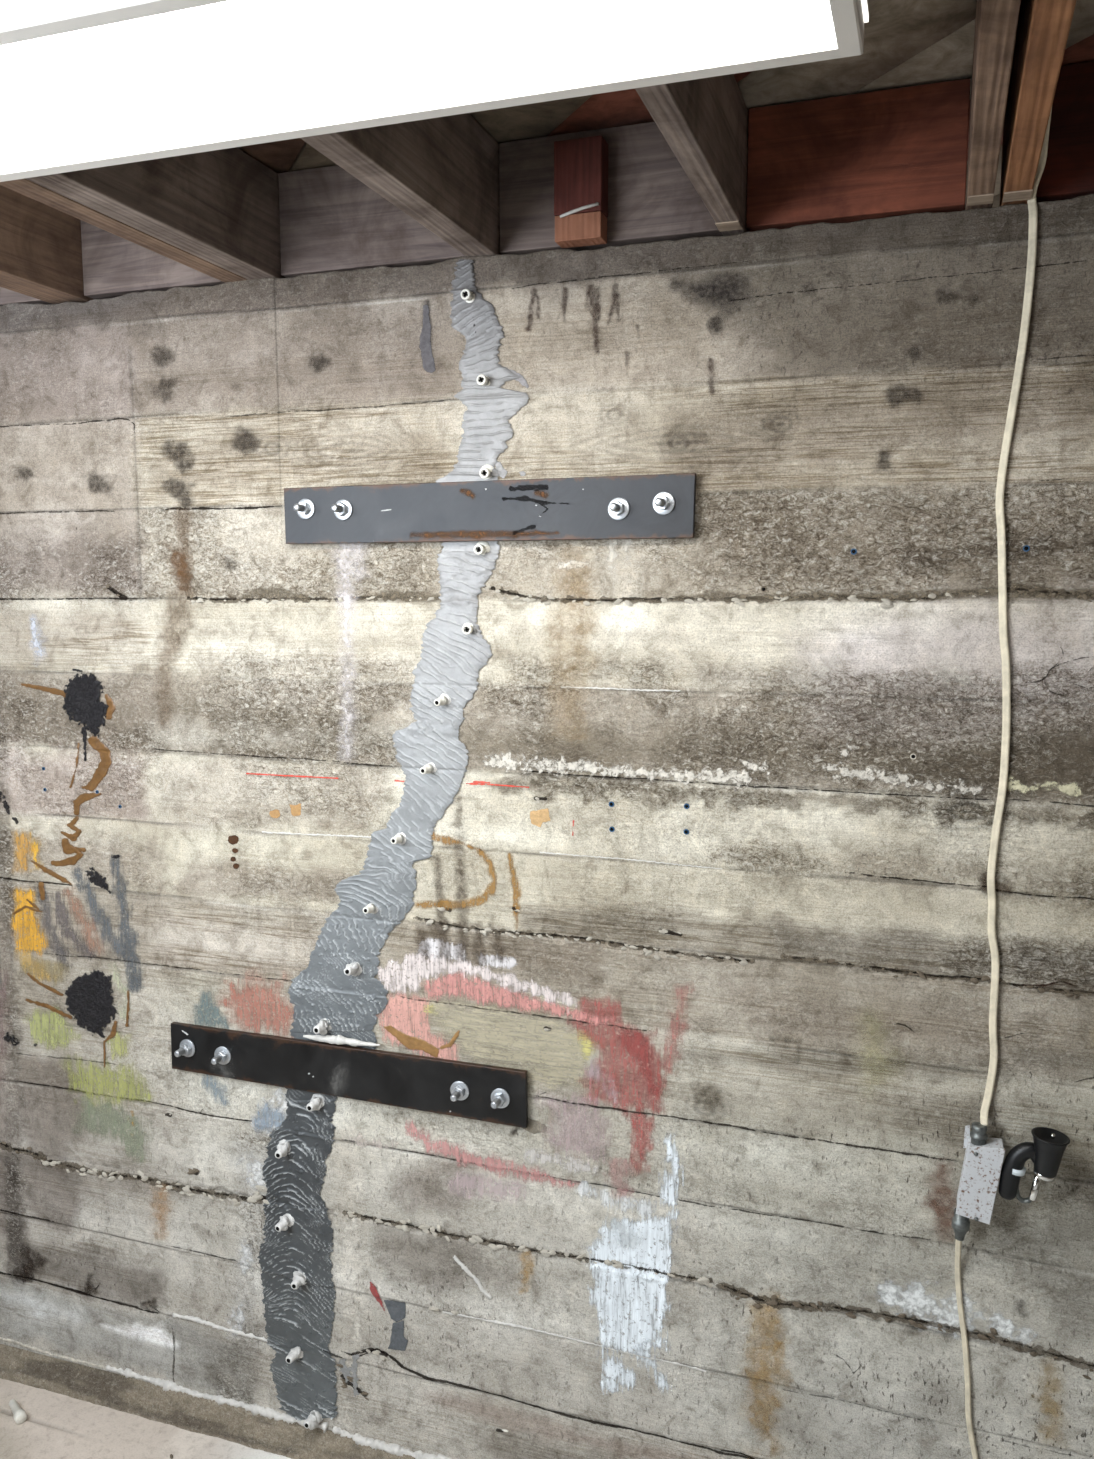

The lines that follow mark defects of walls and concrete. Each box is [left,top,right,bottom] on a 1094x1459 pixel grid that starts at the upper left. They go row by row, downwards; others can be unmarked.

corrosion [411,531,558,539]
crack [361,1215,1094,1403]
crack [323,1348,754,1459]
crack [783,1355,929,1422]